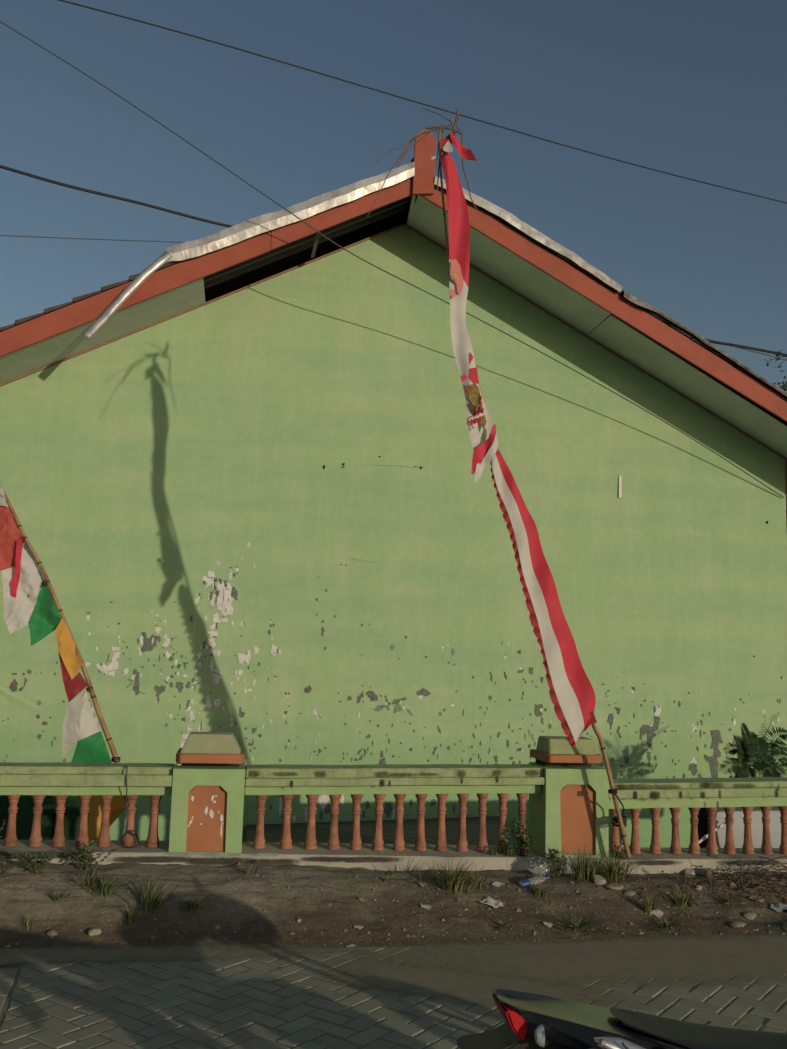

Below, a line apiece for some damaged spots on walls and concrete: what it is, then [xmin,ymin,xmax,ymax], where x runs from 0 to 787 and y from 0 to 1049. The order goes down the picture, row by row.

peeling [85,539,321,765]
peeling [337,641,552,764]
peeling [602,683,676,779]
peeling [667,694,749,778]
peeling [188,795,224,837]